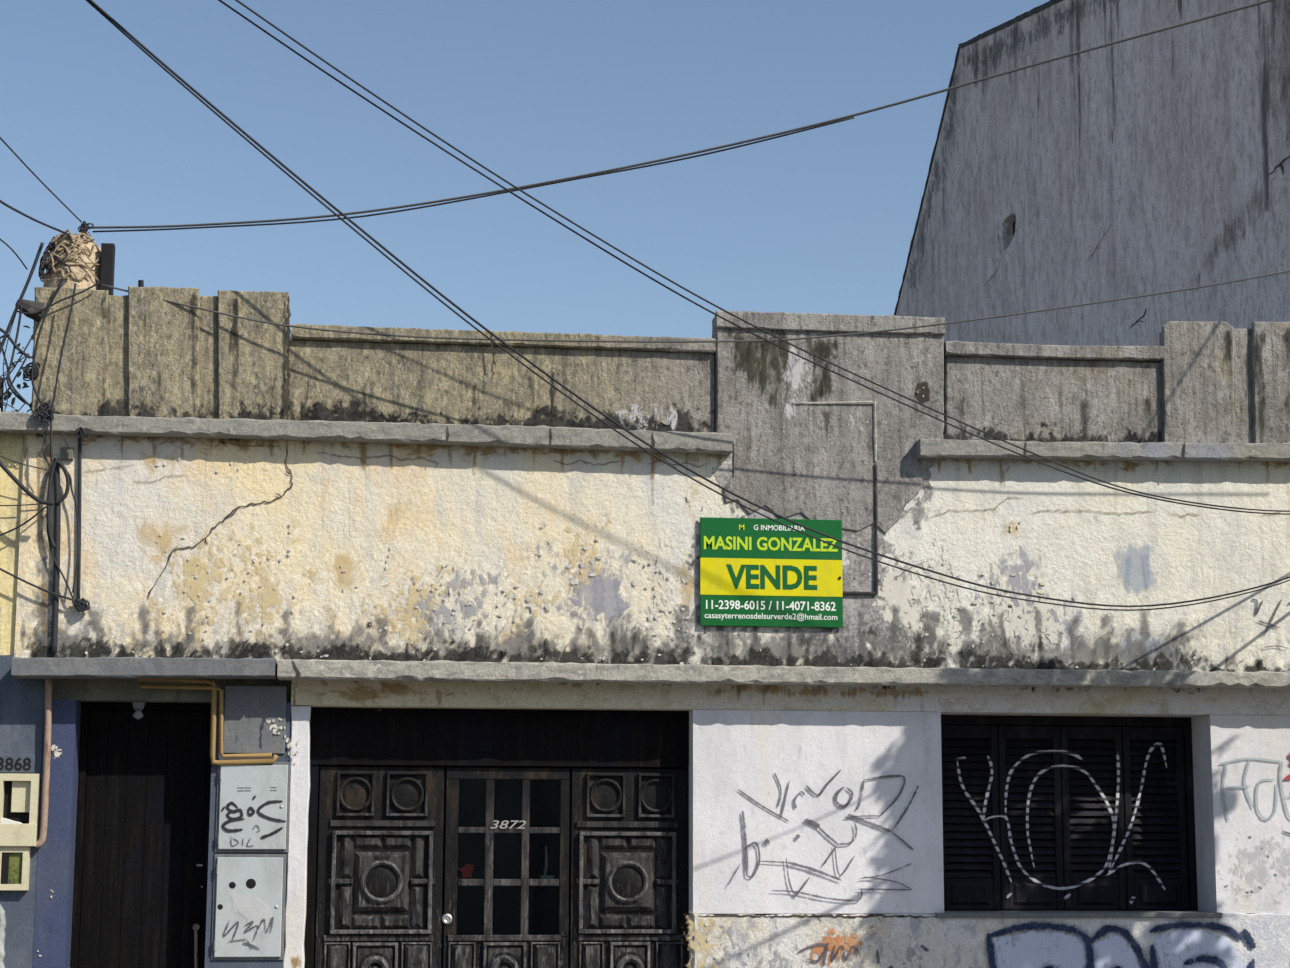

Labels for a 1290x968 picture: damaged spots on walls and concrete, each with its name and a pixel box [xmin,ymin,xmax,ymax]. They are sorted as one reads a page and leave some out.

crack [1268,155,1290,175]
crack [147,296,450,600]
corrosion [332,442,366,468]
leakage [40,384,715,432]
corrosion [389,444,666,476]
leakage [728,328,839,432]
leakage [943,400,1162,443]
peeling [141,523,318,654]
peeling [336,511,611,652]
leakage [23,434,1290,672]
peeling [637,495,716,653]
peeling [733,459,1076,667]